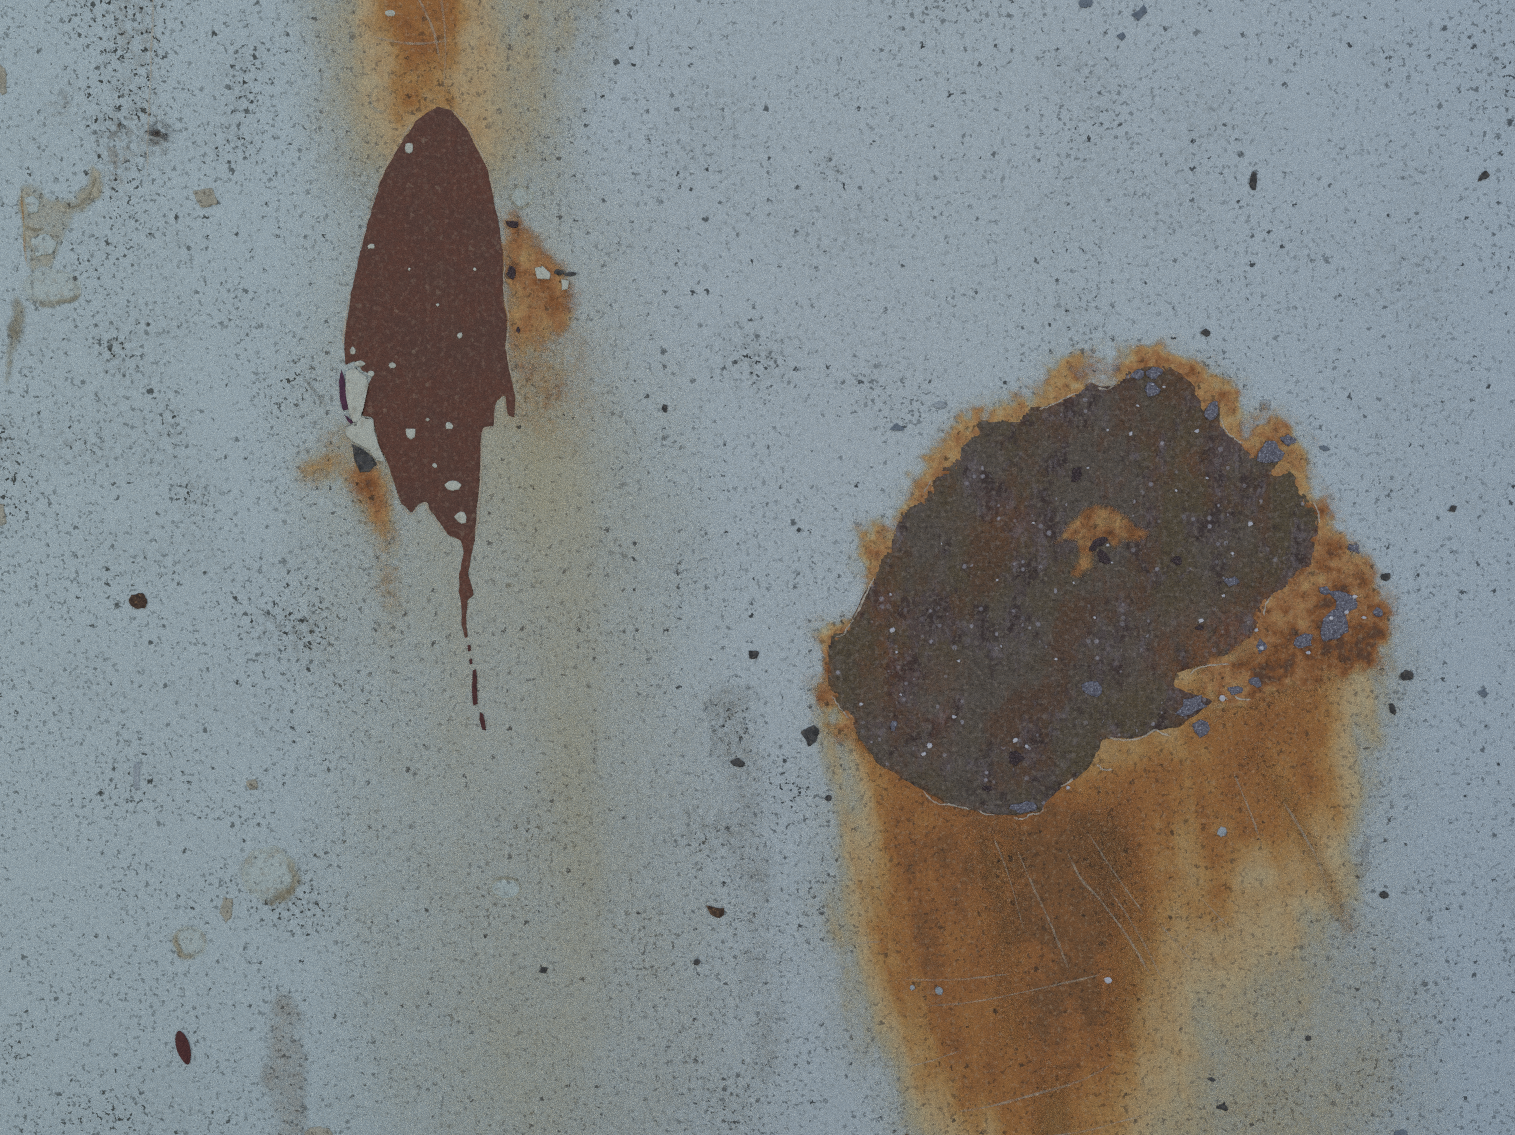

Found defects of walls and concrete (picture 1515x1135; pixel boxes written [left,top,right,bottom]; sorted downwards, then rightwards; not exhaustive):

rust [322,0,575,182]
rust [301,439,393,550]
rust [815,343,1393,1135]